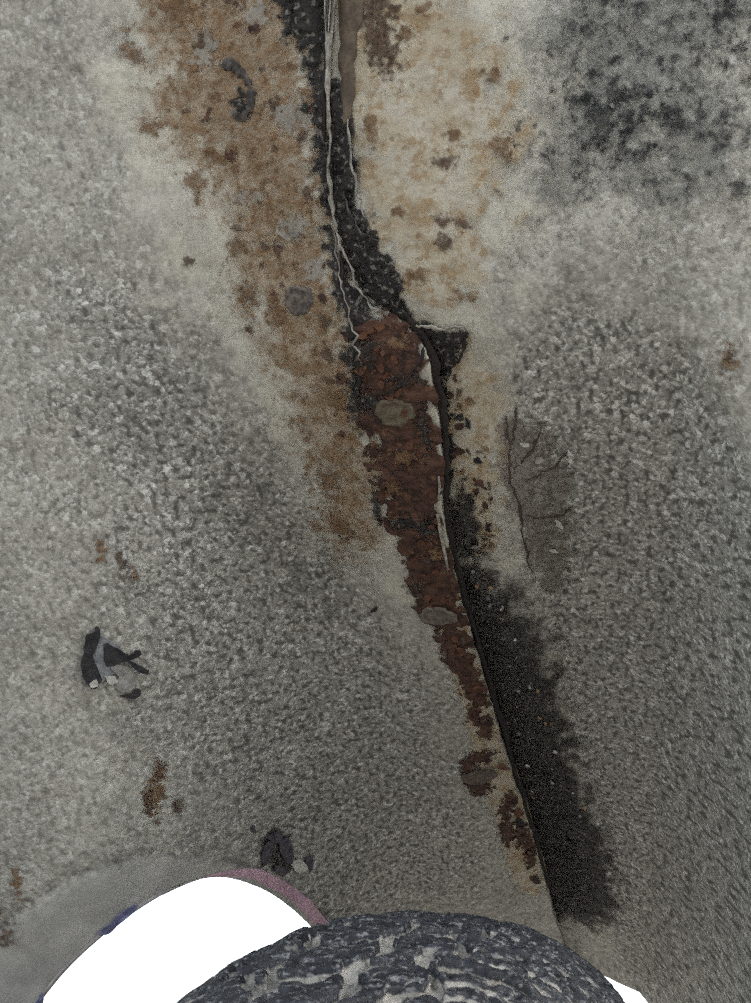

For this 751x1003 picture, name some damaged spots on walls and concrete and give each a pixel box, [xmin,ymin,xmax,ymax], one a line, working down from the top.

crack [319,40,327,141]
peeling [80,626,149,699]
rust [119,0,545,896]
crack [339,251,551,888]
damp [272,0,630,933]